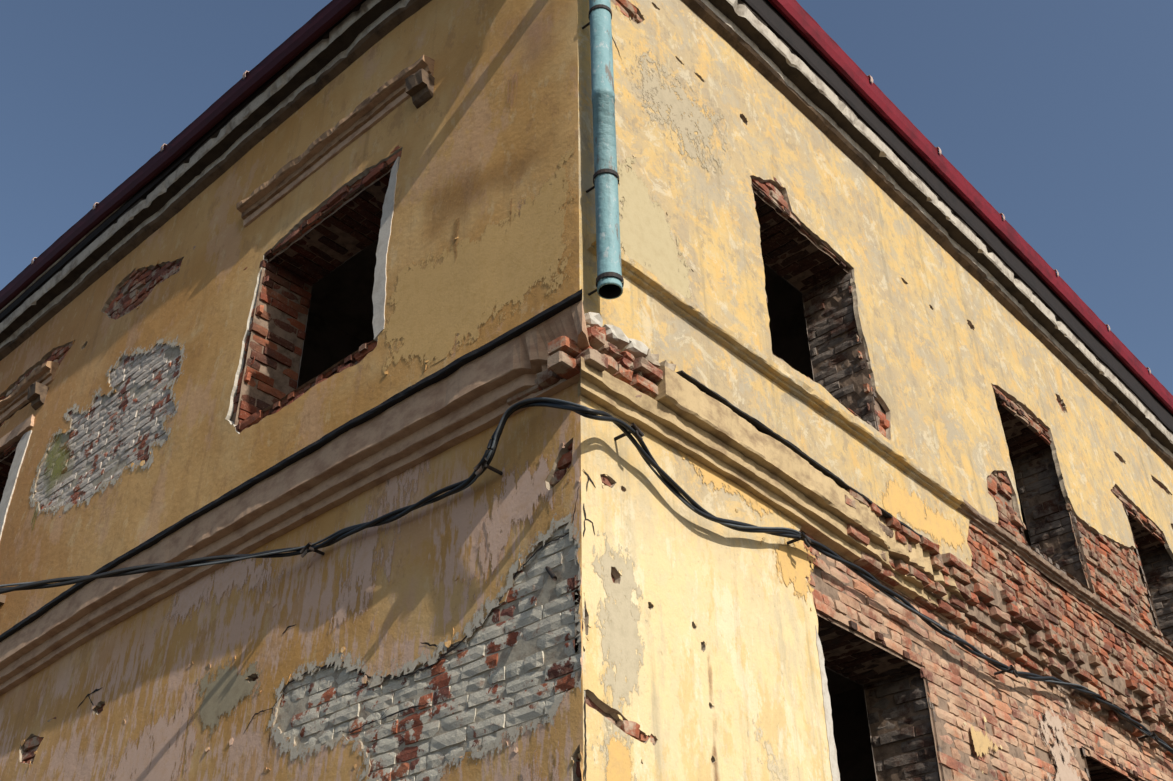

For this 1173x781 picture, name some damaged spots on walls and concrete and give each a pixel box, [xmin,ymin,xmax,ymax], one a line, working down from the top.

spalling [610,0,660,24]
flaking render [101,246,196,320]
flaking render [0,340,87,400]
flaking render [24,334,187,518]
peeling [142,546,288,646]
flaking render [266,438,658,781]
flaking render [677,450,1173,781]
flaking render [879,383,1173,707]
spalling [92,701,105,715]
peeling [105,658,263,781]